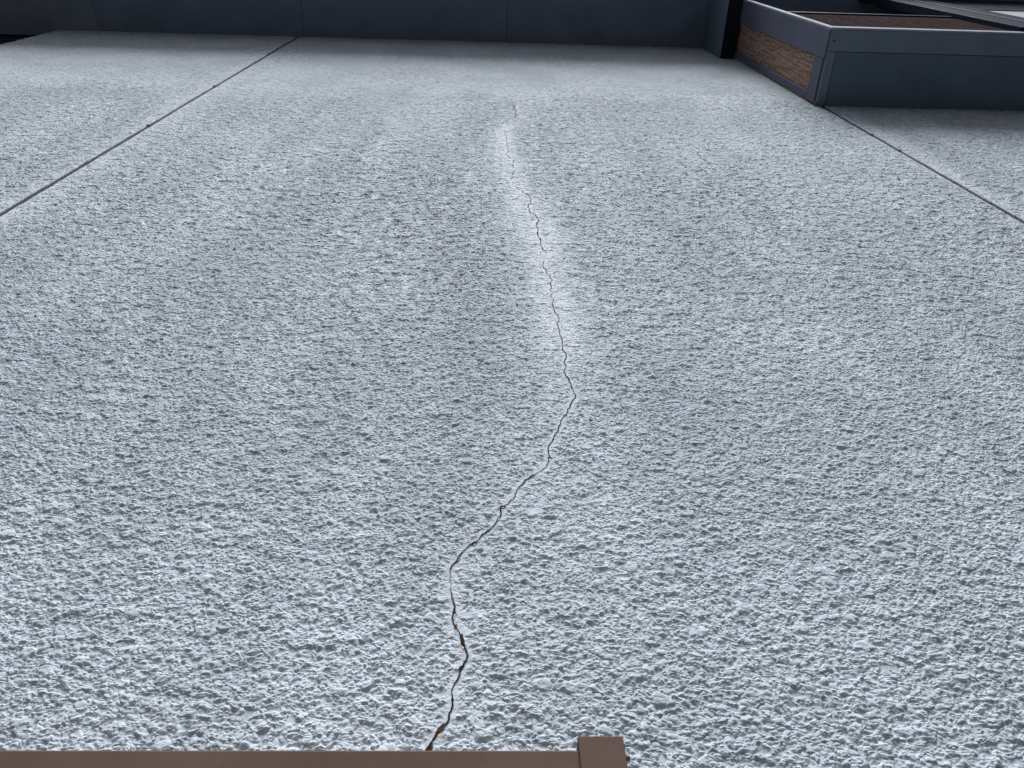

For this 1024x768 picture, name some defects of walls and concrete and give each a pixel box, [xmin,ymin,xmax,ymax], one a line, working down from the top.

crack [426,105,576,751]